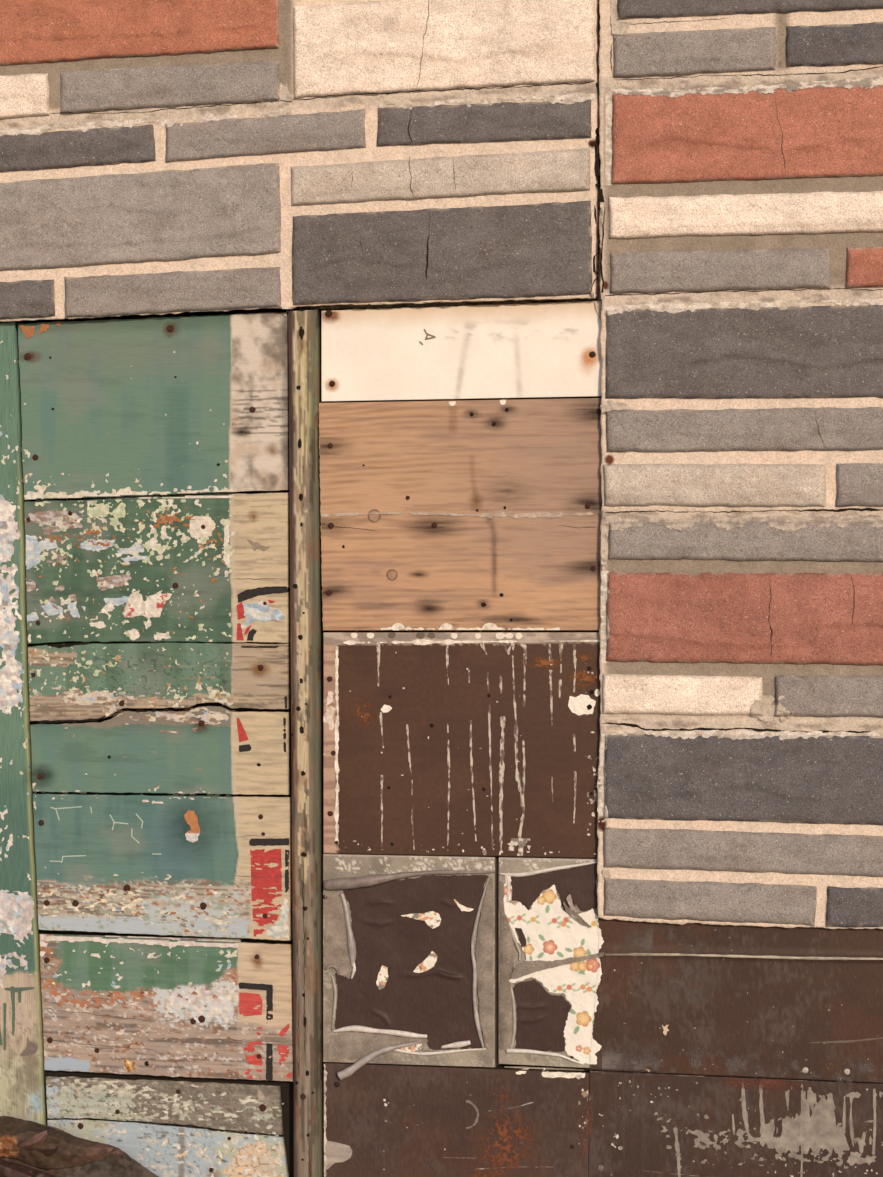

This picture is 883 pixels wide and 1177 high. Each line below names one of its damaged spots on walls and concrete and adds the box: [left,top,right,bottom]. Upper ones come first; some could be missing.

crack [51,0,883,297]
peeling [0,414,285,810]
spalling [321,511,883,716]
peeling [0,805,29,861]
crack [29,708,185,724]
peeling [323,639,517,850]
peeling [481,838,531,856]
spalling [587,695,883,836]
peeling [266,898,293,939]
peeling [0,867,284,1177]
rust [475,1118,526,1177]
peeling [618,1059,883,1177]